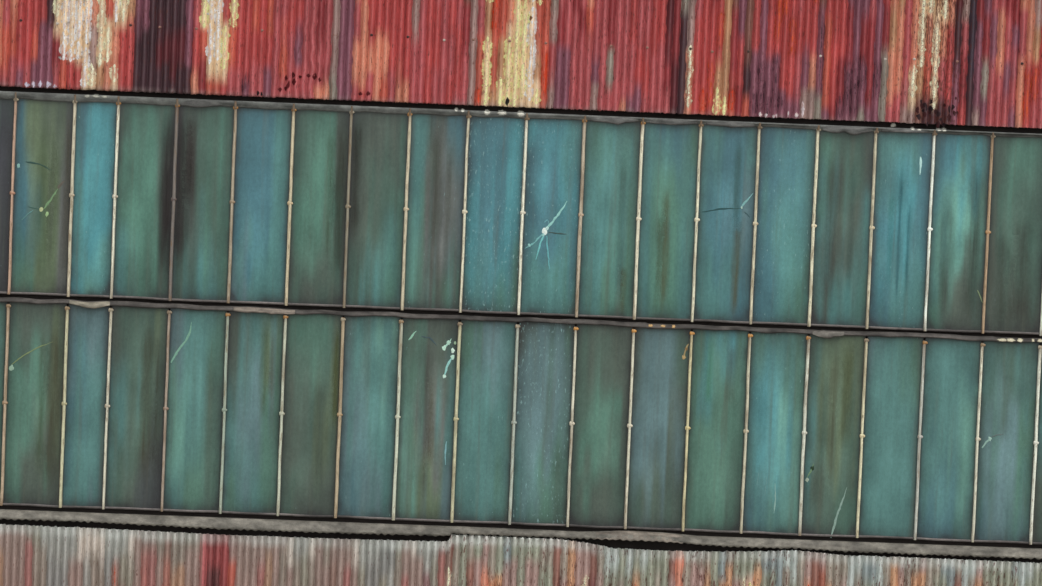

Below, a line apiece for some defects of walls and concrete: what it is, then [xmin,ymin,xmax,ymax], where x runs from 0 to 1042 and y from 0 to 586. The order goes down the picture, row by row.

peeling [52,0,130,88]
corrosion [278,72,321,92]
peeling [481,0,543,106]
corrosion [915,97,958,128]
crack [526,201,567,269]